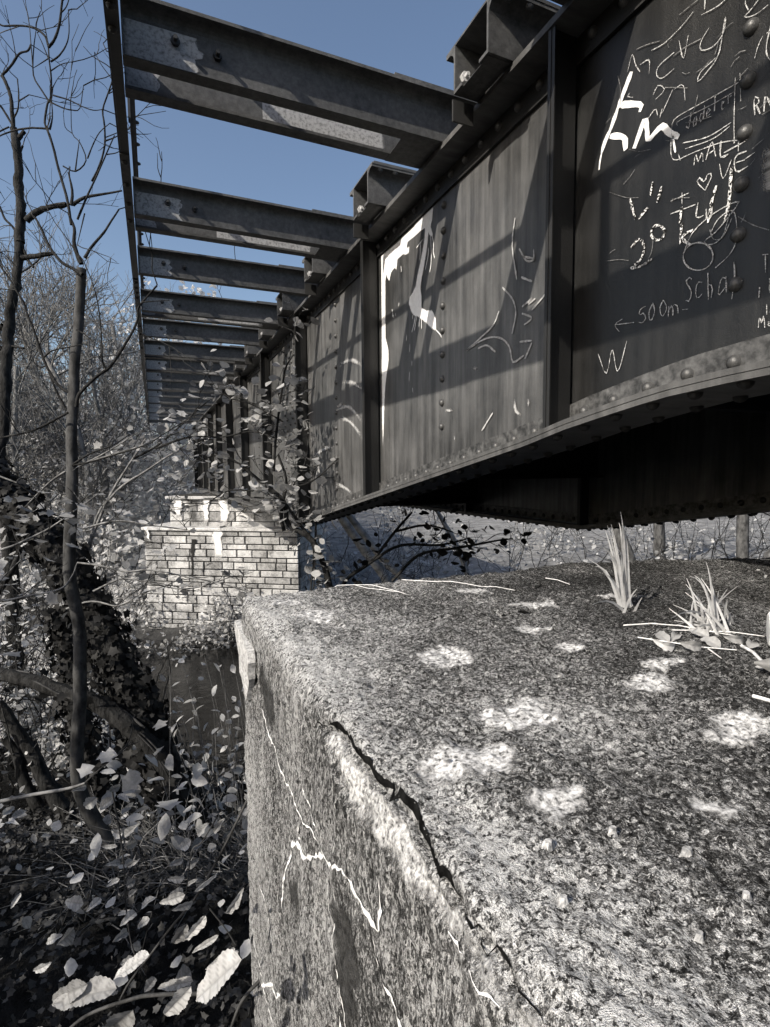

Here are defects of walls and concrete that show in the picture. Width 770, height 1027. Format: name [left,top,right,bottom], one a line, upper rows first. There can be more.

crack [313,721,553,1027]